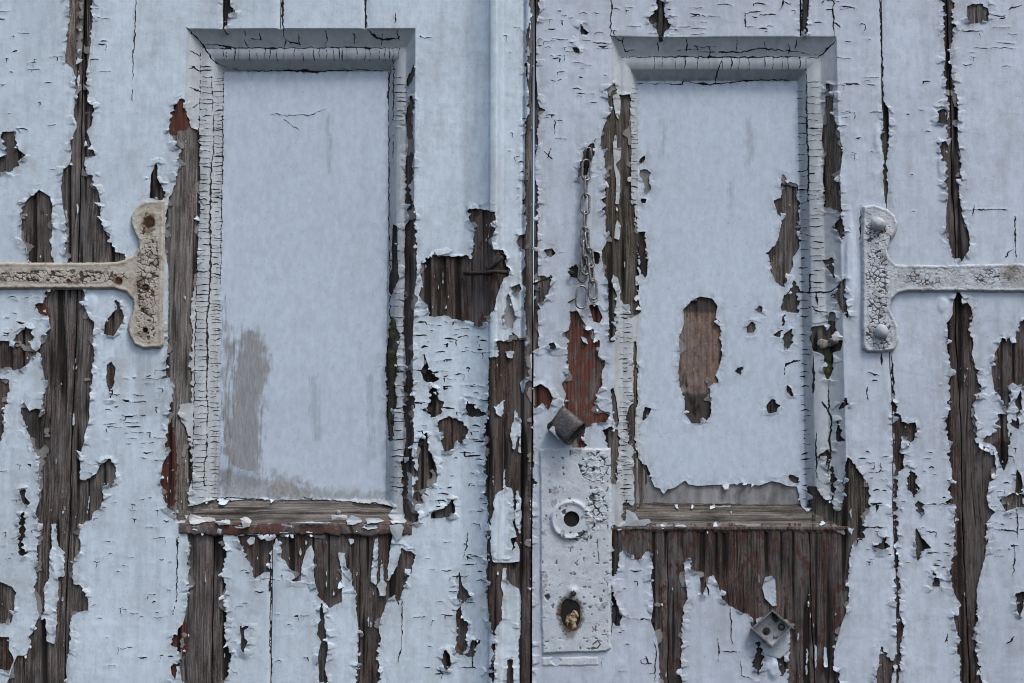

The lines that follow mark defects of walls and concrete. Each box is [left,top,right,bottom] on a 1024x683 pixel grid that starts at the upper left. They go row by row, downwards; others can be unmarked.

peeling [0,131,26,173]
peeling [0,289,124,683]
peeling [20,0,126,263]
damp [221,327,270,479]
crack [93,0,491,683]
peeling [150,0,925,683]
crack [538,0,884,508]
peeling [932,293,1024,683]